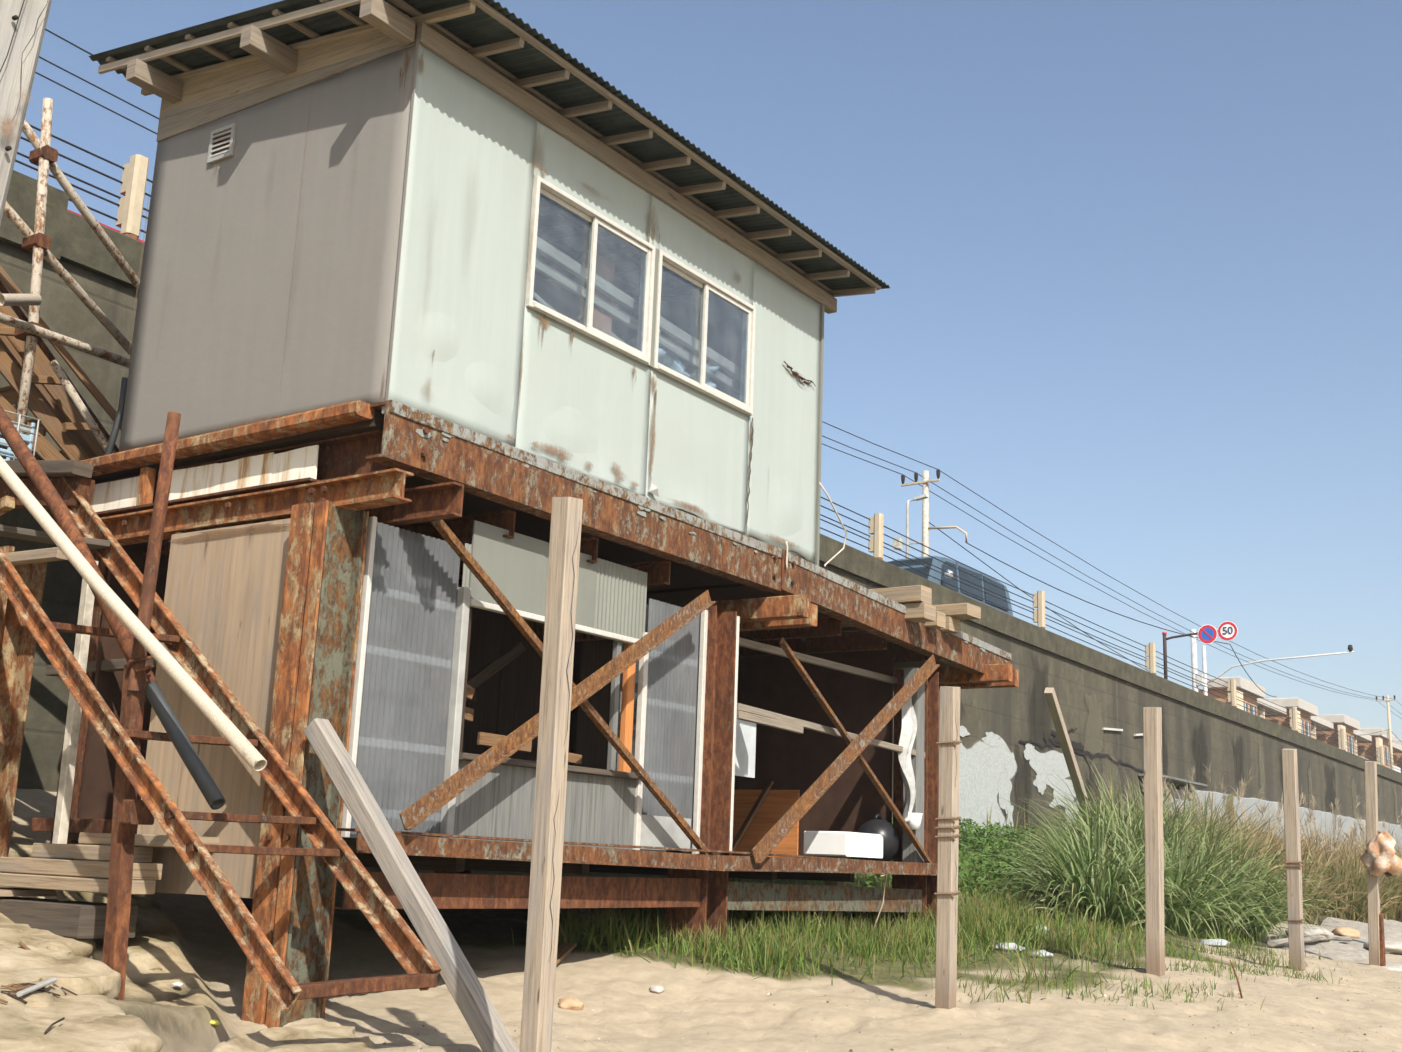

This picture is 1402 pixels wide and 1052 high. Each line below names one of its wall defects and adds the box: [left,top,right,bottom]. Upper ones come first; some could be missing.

peeling [415,429,479,446]
corrosion [533,442,568,460]
corrosion [613,376,657,487]
peeling [959,726,1085,837]